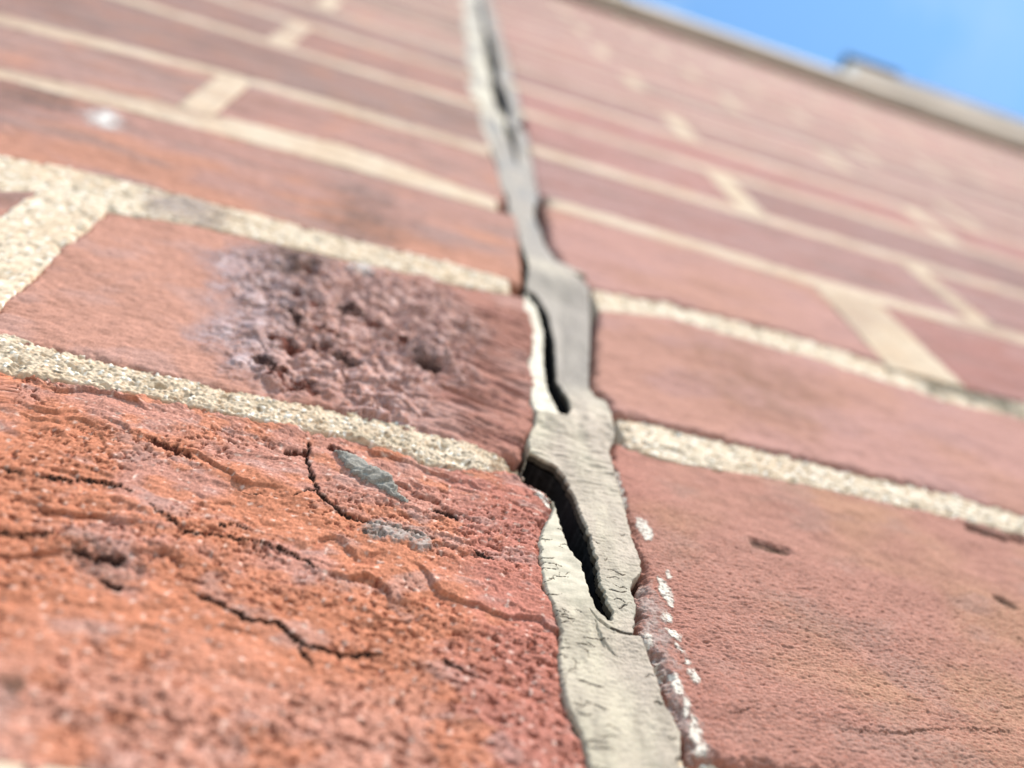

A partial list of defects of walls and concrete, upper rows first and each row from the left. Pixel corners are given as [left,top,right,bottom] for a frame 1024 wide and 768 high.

crack [478,0,517,162]
spalling [238,253,484,429]
crack [521,289,566,415]
crack [0,468,318,569]
crack [190,592,385,667]
crack [283,443,362,523]
crack [442,659,481,679]
crack [474,550,494,560]
crack [519,462,633,768]
water stain [635,586,711,766]